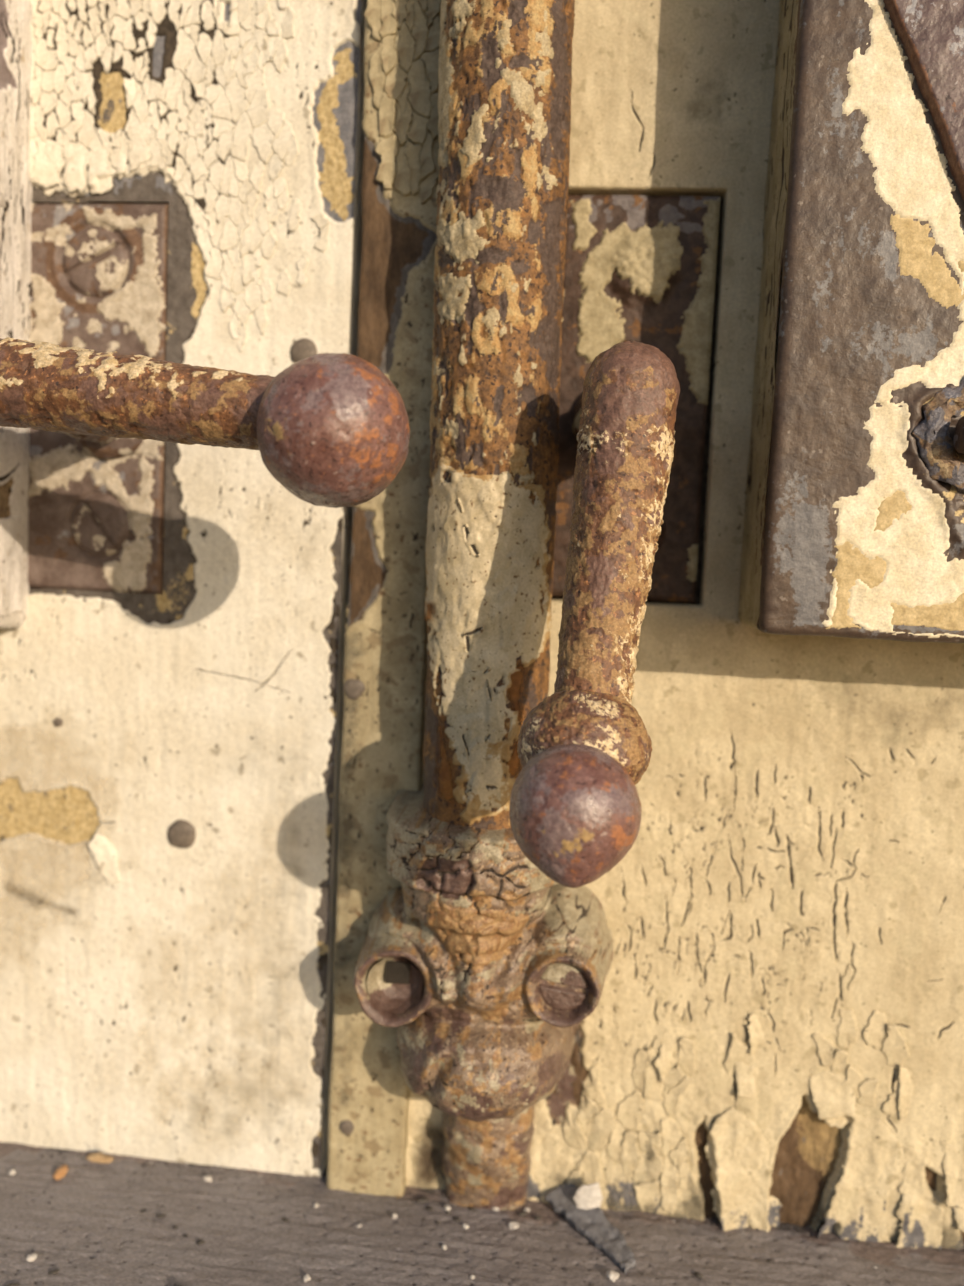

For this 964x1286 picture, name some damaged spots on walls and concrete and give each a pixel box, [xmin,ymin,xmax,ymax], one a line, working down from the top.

crack [2,0,330,353]
peeling [312,41,493,374]
crack [364,0,442,204]
peeling [449,0,475,39]
peeling [495,17,558,190]
peeling [822,0,964,638]
peeling [425,456,552,824]
corrosion [507,664,524,725]
peeling [0,778,120,889]
crack [562,729,955,1215]
corrosion [417,1128,445,1183]
peeling [695,1013,964,1249]